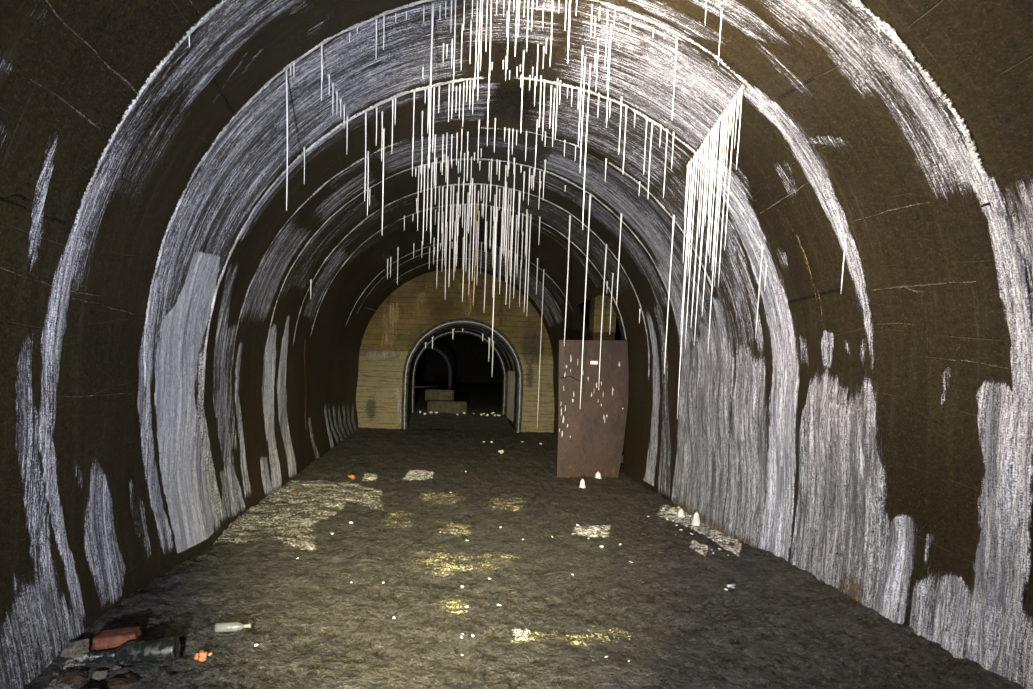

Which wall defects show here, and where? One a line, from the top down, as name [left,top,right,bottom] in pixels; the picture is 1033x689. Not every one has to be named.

damp [43,650,95,689]
damp [16,0,302,620]
damp [410,551,512,577]
damp [695,0,1033,681]